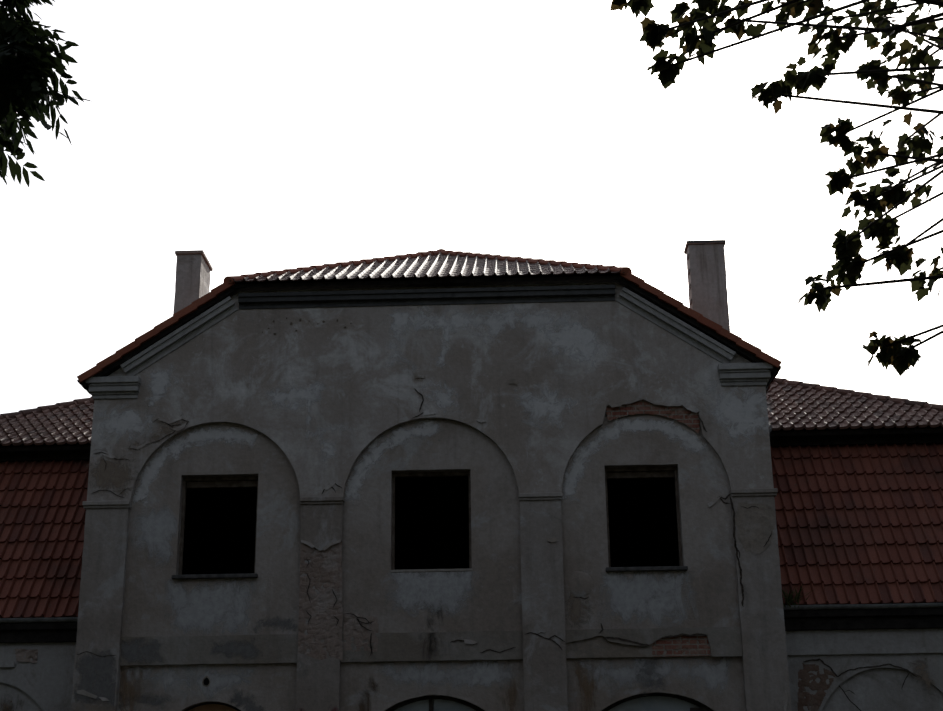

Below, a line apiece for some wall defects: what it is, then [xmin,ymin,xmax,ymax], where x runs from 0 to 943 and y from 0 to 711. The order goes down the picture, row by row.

crack [413,378,436,418]
spalling [606,400,700,433]
spalling [797,658,838,711]
crack [838,664,917,711]